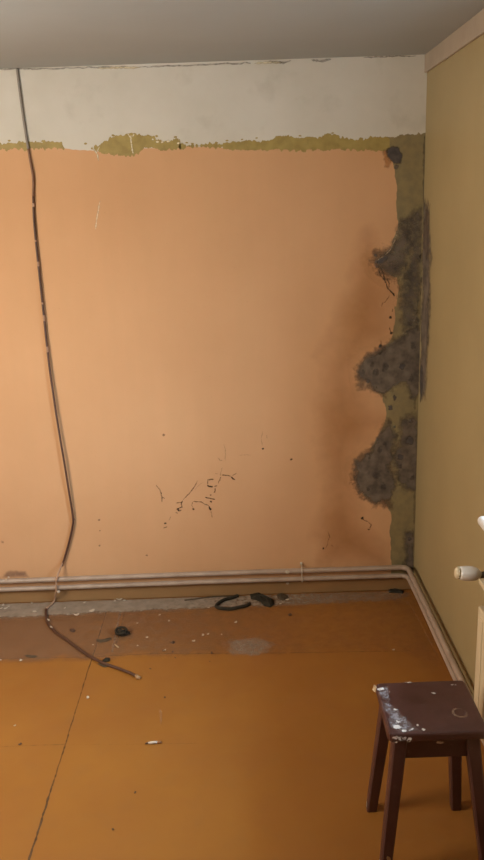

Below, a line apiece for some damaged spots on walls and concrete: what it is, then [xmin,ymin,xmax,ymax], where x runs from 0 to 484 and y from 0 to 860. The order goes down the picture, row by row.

peeling [0,140,64,151]
peeling [84,132,426,347]
water stain [353,203,431,508]
peeling [370,381,419,575]